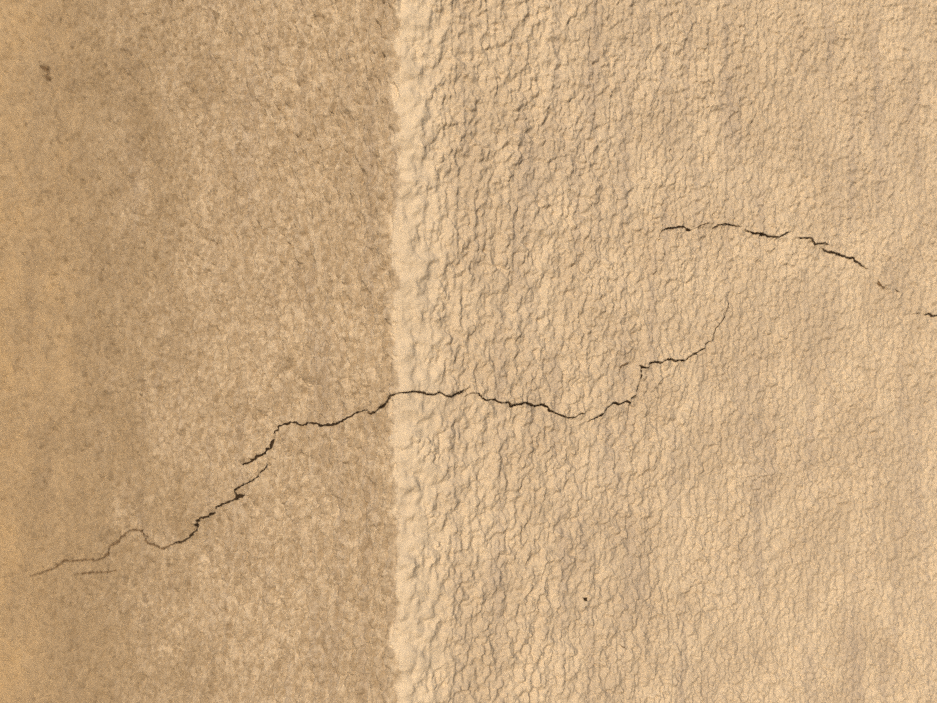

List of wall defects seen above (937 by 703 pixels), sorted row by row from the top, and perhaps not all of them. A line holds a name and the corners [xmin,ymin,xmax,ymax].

crack [655,222,900,292]
crack [917,308,937,317]
crack [31,303,729,576]